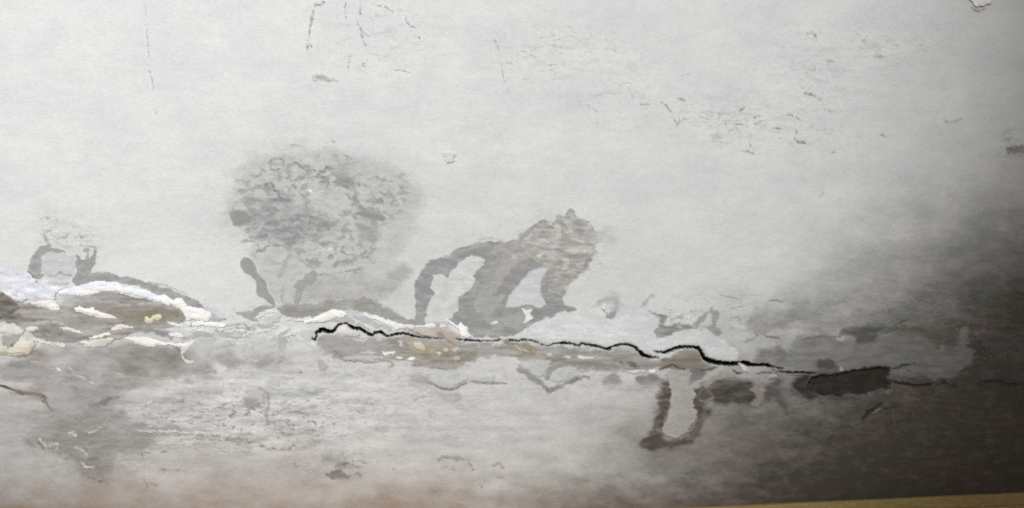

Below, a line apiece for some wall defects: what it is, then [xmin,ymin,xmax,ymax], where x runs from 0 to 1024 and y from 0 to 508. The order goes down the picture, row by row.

leakage [27,140,615,337]
flaking render [0,267,749,382]
crack [312,322,816,414]
leakage [635,299,805,451]
peeling [785,327,976,404]